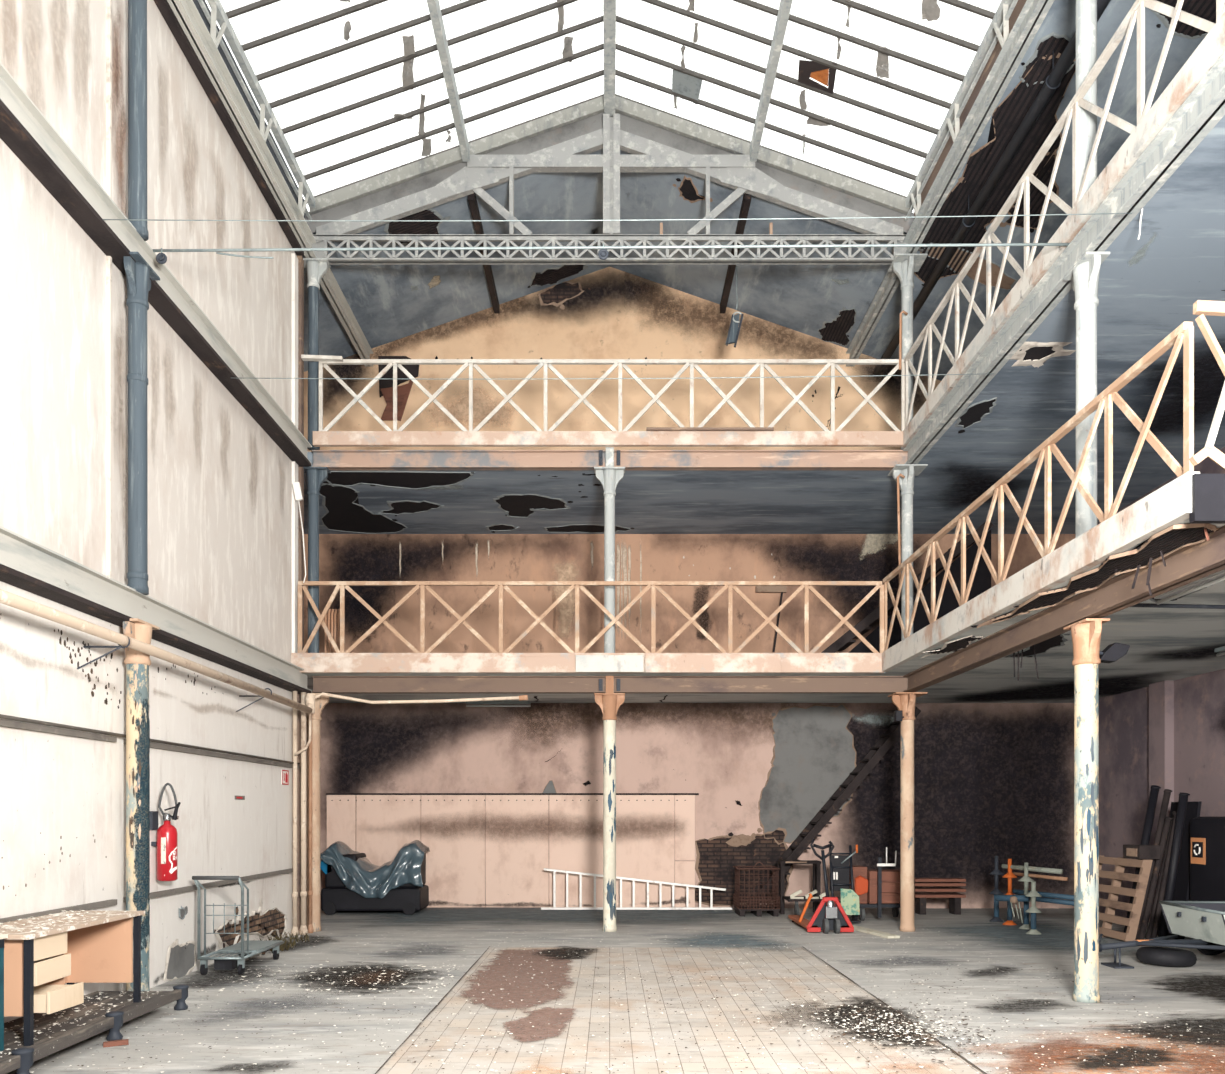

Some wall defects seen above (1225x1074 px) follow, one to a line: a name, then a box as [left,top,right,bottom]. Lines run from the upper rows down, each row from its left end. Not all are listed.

spalling [673,175,713,203]
spalling [914,32,1076,290]
spalling [528,265,591,310]
spalling [818,307,857,347]
spalling [1010,342,1076,368]
spalling [955,397,997,434]
spalling [319,471,475,534]
spalling [485,473,601,533]
spalling [544,524,634,533]
spalling [921,524,1219,658]
peeling [0,629,150,950]
spalling [695,704,894,906]